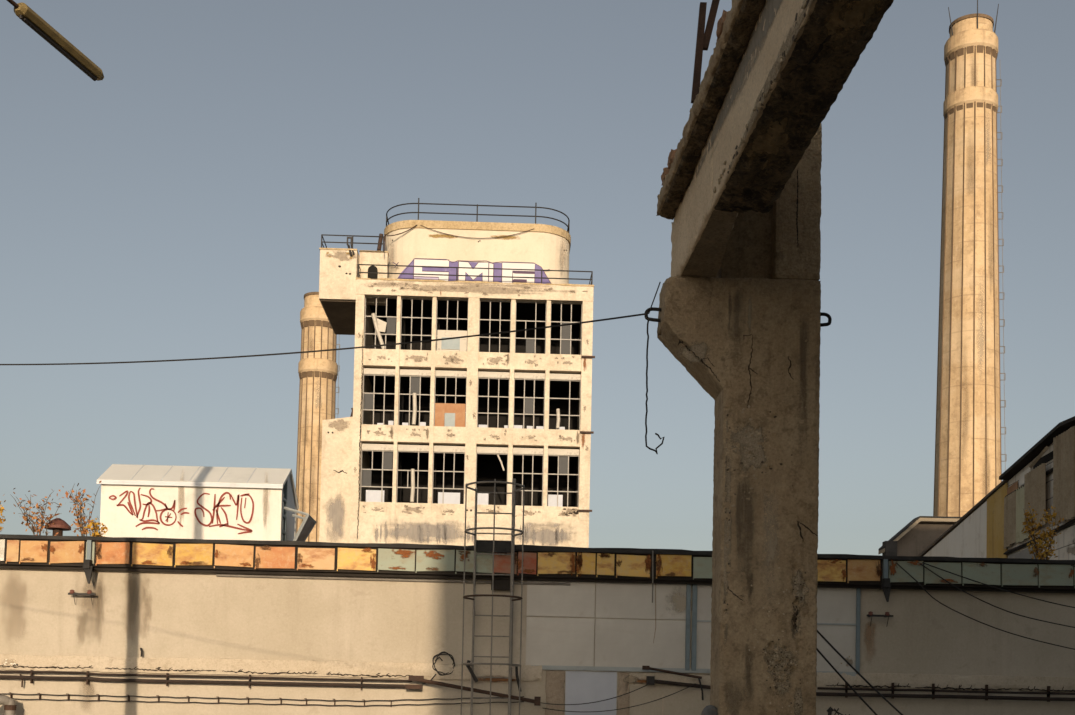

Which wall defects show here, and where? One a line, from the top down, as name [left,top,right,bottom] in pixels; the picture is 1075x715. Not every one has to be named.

spalling [713,0,818,193]
crack [678,340,720,382]
crack [743,334,758,408]
water stain [375,523,474,542]
water stain [519,523,567,545]
rust [389,549,444,571]
rust [570,552,583,576]